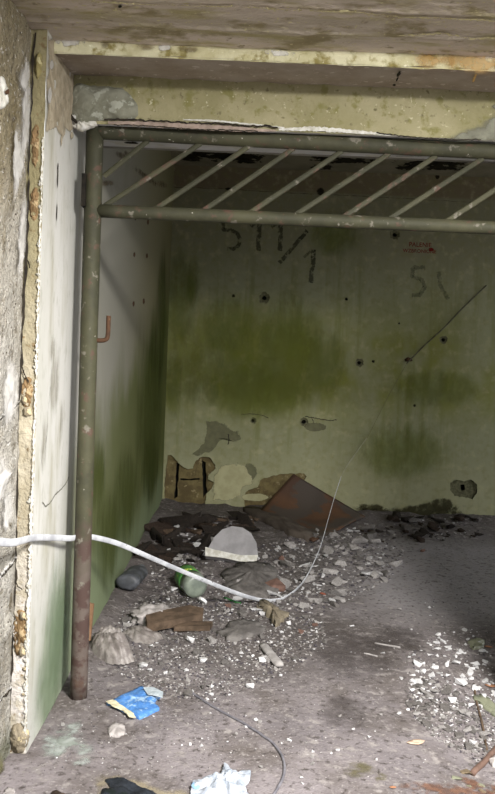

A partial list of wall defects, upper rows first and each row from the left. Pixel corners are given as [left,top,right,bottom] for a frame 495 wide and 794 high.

rust [420,54,495,82]
crack [0,33,36,441]
peeling [10,39,74,754]
leakage [94,457,104,490]
spalling [164,421,307,506]
peeling [300,417,326,431]
spalling [450,480,477,499]
crack [0,468,22,702]